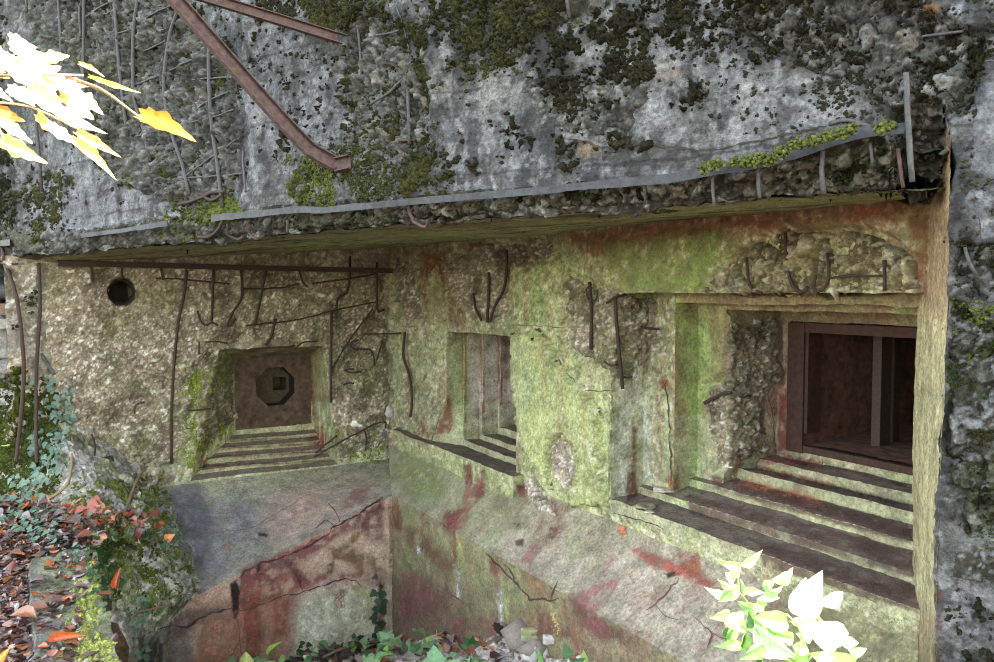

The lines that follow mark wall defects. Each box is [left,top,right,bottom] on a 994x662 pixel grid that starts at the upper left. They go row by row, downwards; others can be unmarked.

spalling [0,0,994,254]
spalling [44,262,424,468]
spalling [441,235,554,322]
spalling [563,273,661,378]
spalling [708,317,782,473]
spalling [699,228,925,302]
spalling [957,245,994,302]
corrosion [409,464,484,569]
crack [142,497,381,660]
corrosion [240,487,400,661]
crack [486,554,559,602]
corrosion [633,548,724,591]